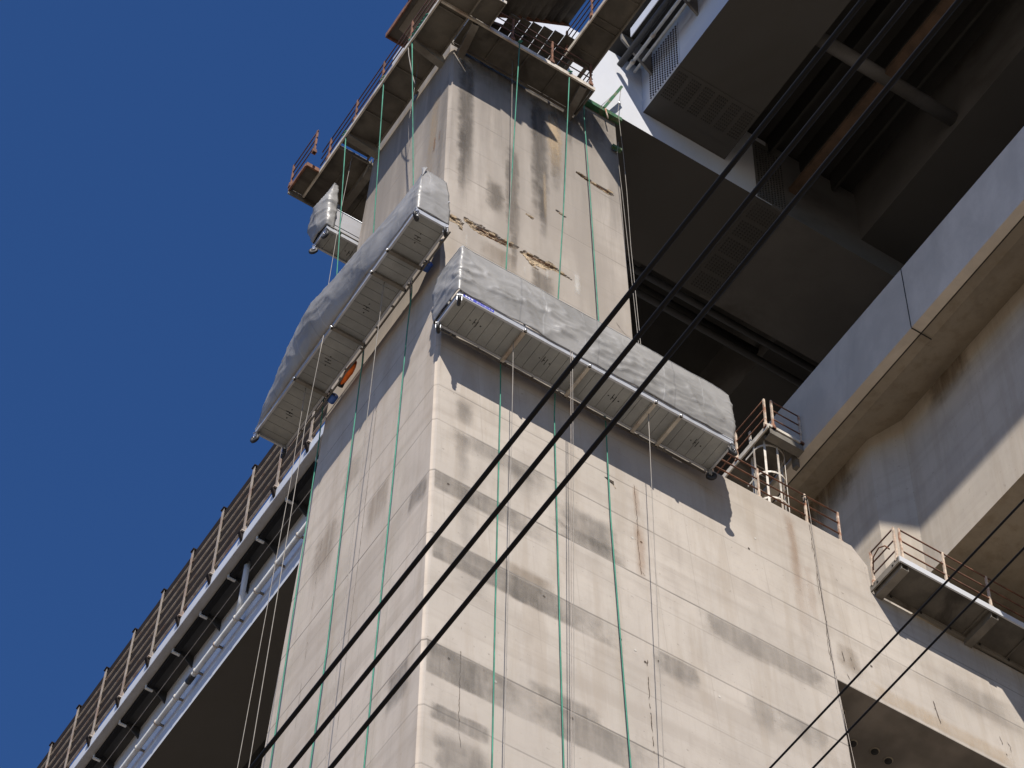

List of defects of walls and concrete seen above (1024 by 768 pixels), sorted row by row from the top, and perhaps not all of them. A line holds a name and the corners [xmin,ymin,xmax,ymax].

leakage [460,53,602,224]
spalling [577,172,614,196]
spalling [449,214,565,277]